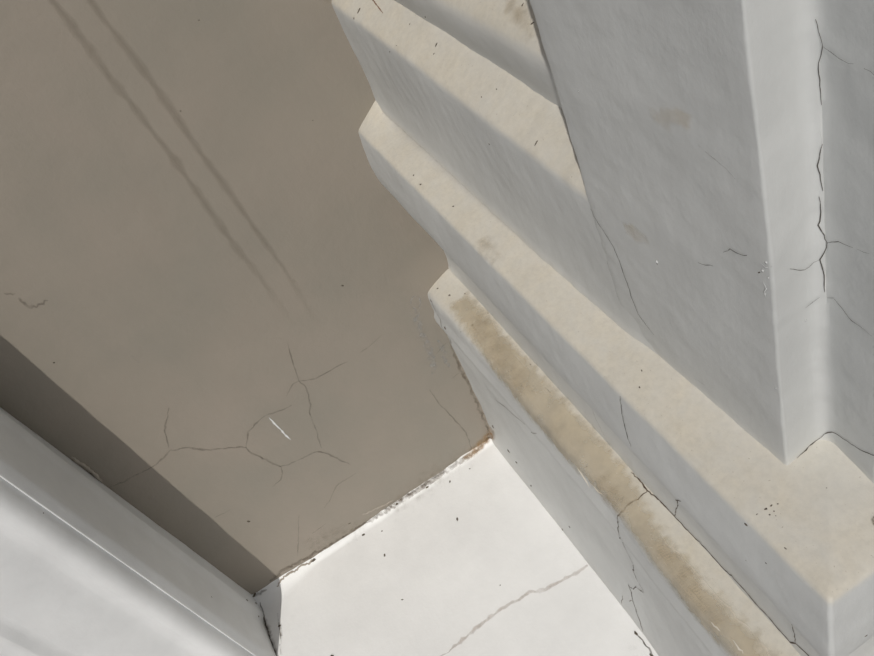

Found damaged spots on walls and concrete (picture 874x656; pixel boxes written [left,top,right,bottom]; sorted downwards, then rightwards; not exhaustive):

crack [815,19,874,105]
crack [794,144,870,335]
crack [802,432,874,456]
crack [617,472,809,656]